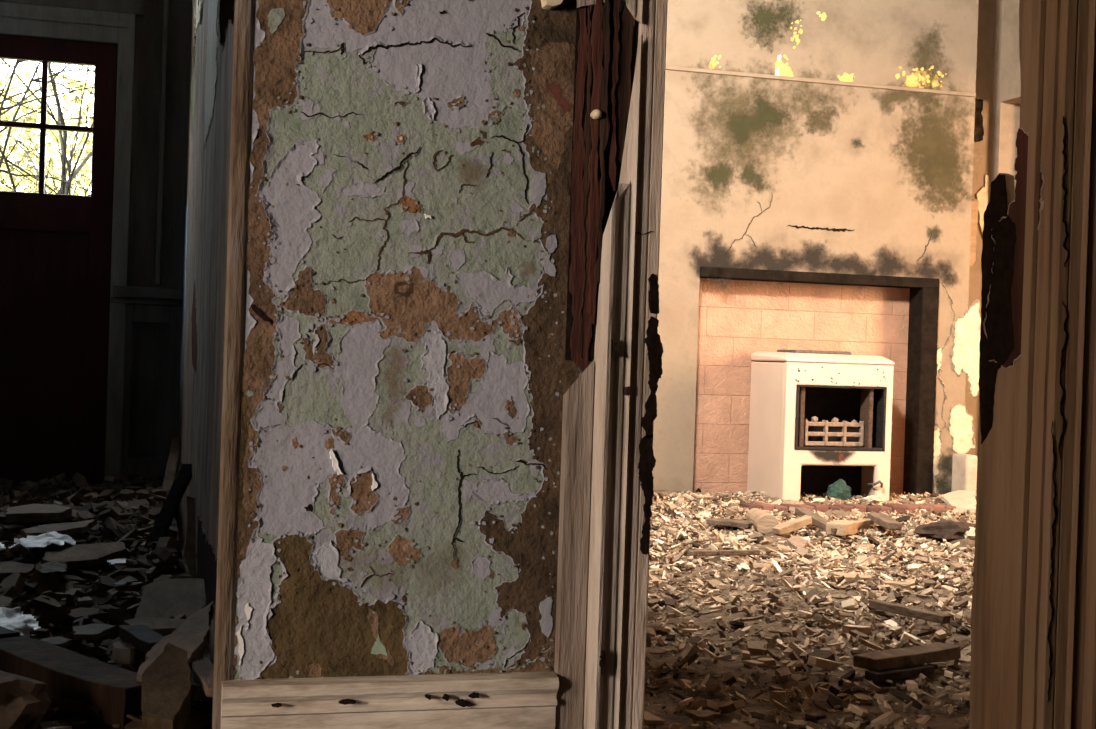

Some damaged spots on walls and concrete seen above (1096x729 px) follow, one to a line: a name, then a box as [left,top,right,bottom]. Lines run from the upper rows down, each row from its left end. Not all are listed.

peeling [193,0,235,149]
crack [303,12,525,64]
mould [698,66,835,192]
leakage [743,0,799,46]
peeling [895,65,947,89]
mould [874,33,969,204]
crack [325,124,539,285]
crack [728,195,855,251]
leakage [927,227,940,242]
peeling [233,0,638,680]
peeling [933,280,981,493]
crack [451,418,547,567]